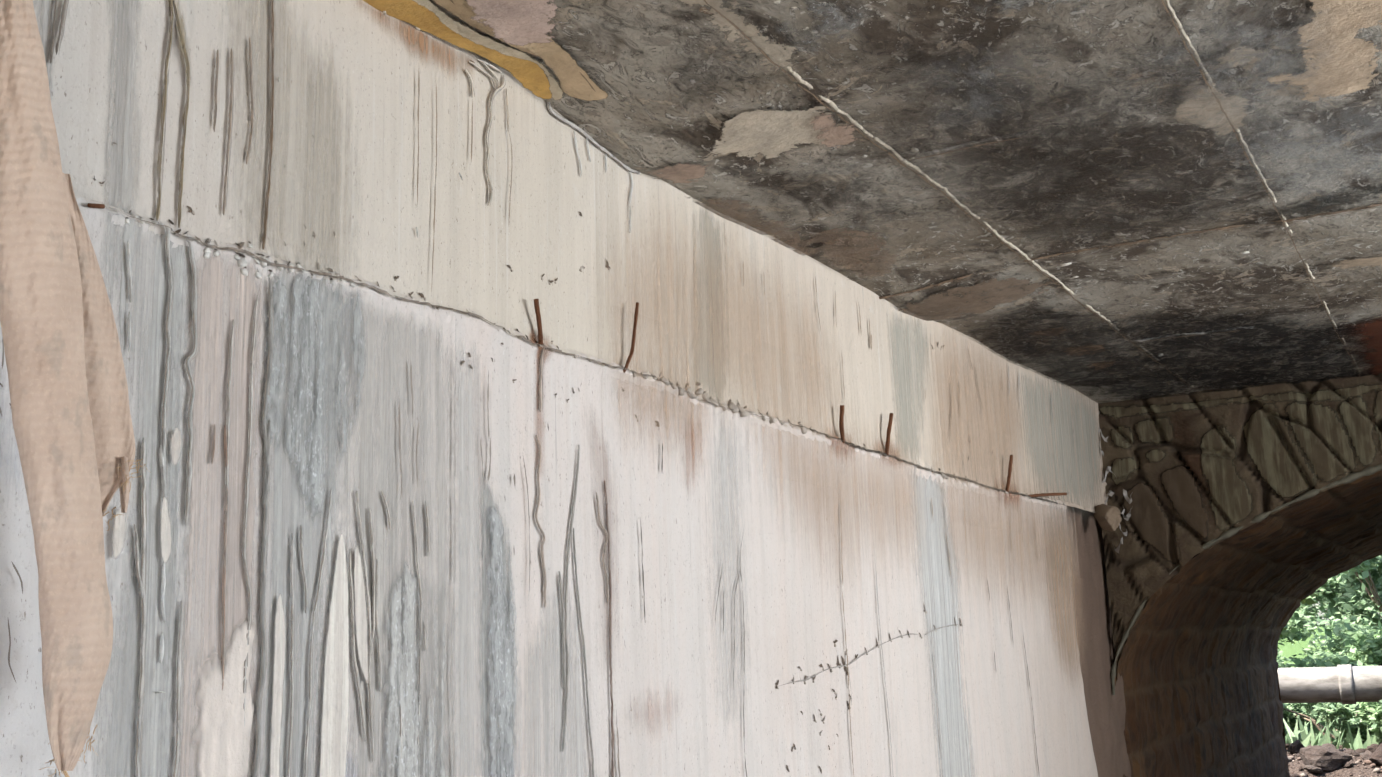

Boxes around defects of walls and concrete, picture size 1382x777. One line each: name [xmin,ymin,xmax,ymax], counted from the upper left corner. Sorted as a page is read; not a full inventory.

peeling [363,0,608,101]
peeling [1263,0,1382,102]
peeling [646,106,899,281]
damp [98,0,190,777]
damp [264,268,514,777]
rust [532,299,546,356]
crack [93,200,1074,590]
rust [623,302,639,373]
crack [715,524,747,777]
crack [777,509,961,774]
rust [880,413,894,456]
damp [914,469,972,777]